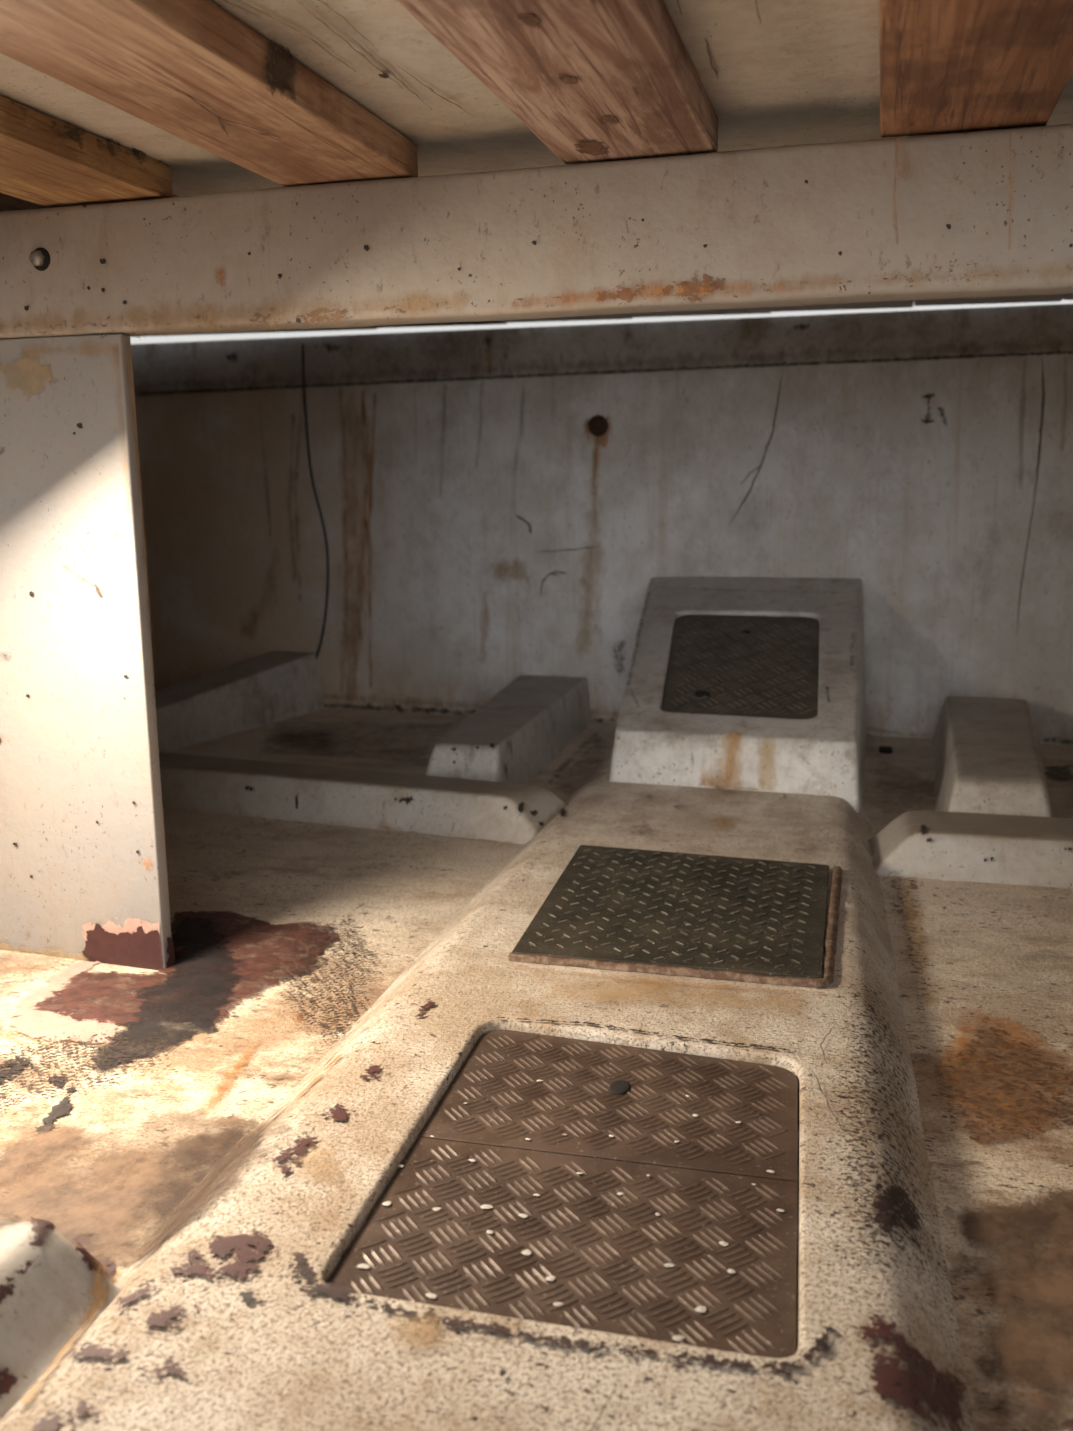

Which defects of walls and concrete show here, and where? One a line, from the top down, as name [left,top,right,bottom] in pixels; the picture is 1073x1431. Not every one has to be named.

crack [728,368,783,527]
peeling [0,906,401,1132]
corrosion [935,1017,1073,1154]
peeling [0,1368,27,1401]
peeling [0,1217,56,1306]
peeling [30,1399,100,1431]
peeling [75,1235,116,1281]
peeling [70,1342,191,1381]
leakage [0,1110,285,1264]
peeling [110,971,973,1431]
leakage [952,1187,1073,1431]